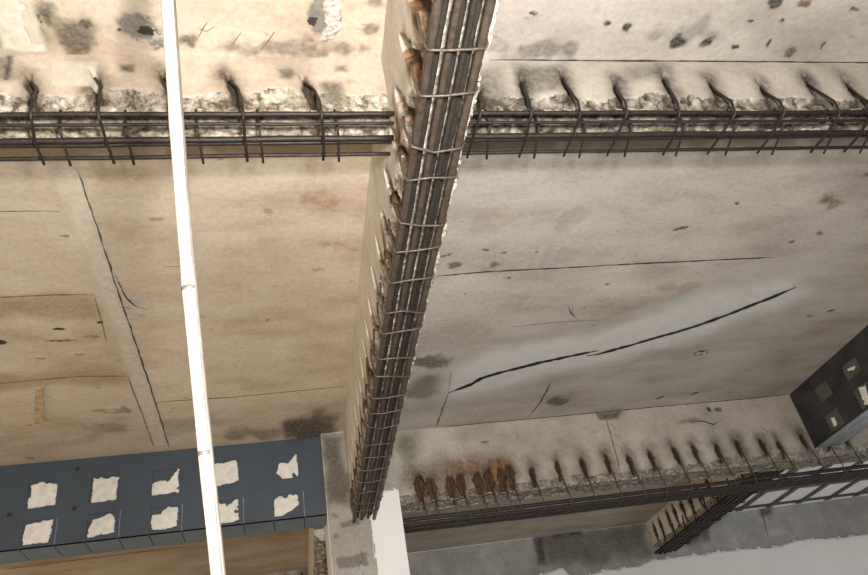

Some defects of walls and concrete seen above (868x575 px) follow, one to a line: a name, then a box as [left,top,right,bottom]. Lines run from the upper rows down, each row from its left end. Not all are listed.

spalling [116,12,164,50]
spalling [0,68,170,138]
crack [0,169,345,447]
crack [436,287,796,470]
peeling [27,482,57,509]
peeling [91,476,119,503]
peeling [152,469,180,496]
peeling [22,520,53,545]
peeling [87,513,115,538]
peeling [151,507,178,530]